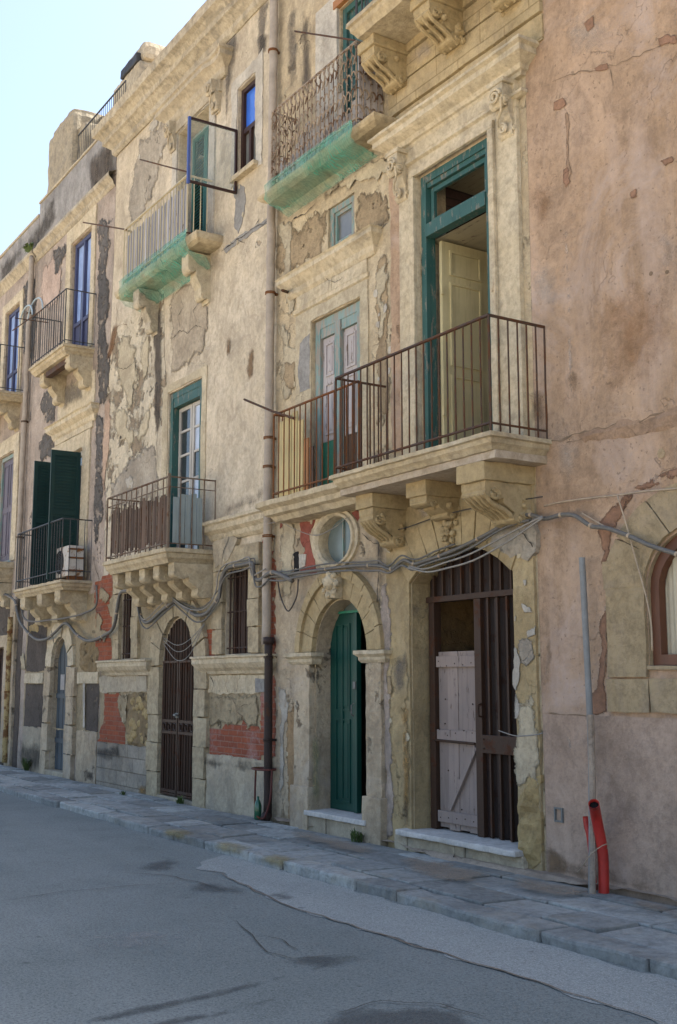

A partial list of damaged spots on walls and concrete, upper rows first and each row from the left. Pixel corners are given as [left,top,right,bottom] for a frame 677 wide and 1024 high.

crack [552,38,659,97]
flaking render [128,116,167,225]
peeling [102,287,170,530]
flaking render [373,254,391,414]
crack [551,407,677,443]
spalling [79,574,150,747]
flaking render [208,674,289,798]
spalling [512,626,545,869]